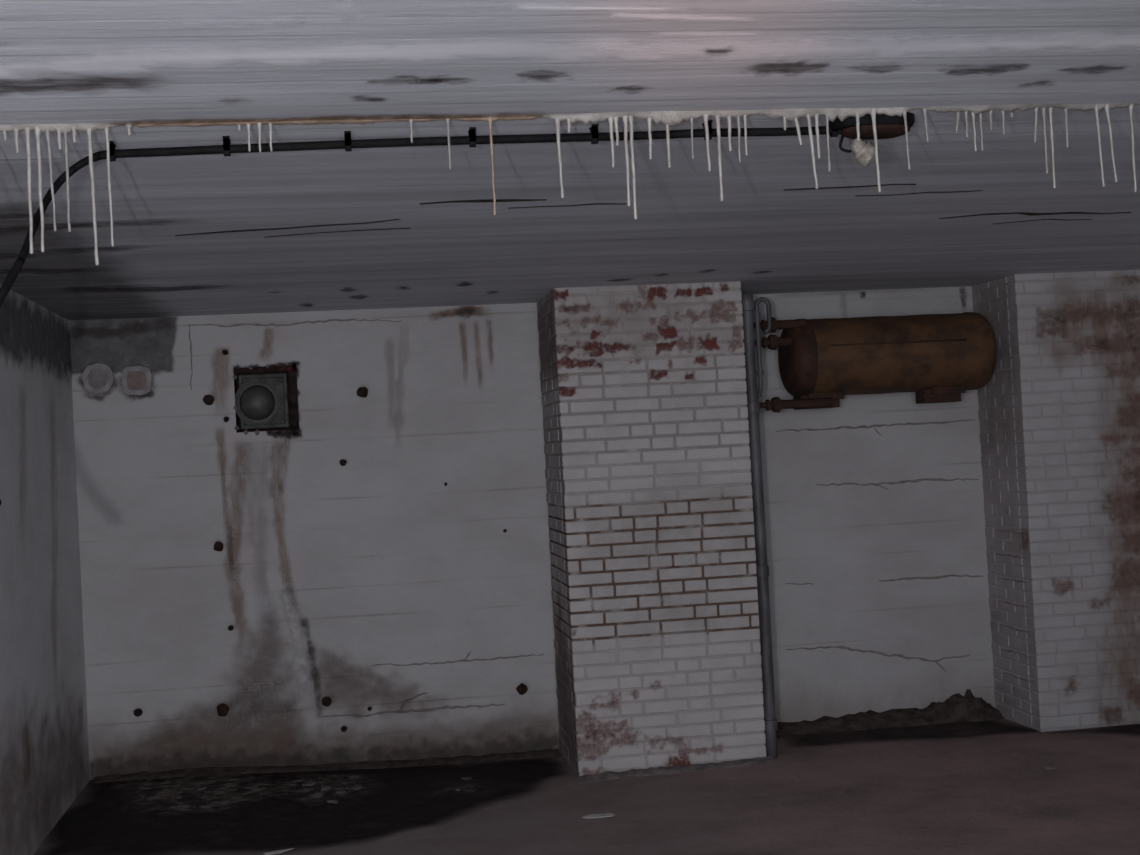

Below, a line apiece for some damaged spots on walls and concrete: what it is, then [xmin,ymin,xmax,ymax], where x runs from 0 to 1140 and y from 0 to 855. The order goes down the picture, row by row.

damp [543,103,1140,220]
damp [0,123,212,321]
peeling [554,290,629,396]
peeling [609,274,742,380]
crack [786,646,970,672]
peeling [576,700,636,775]
spalling [651,738,722,766]